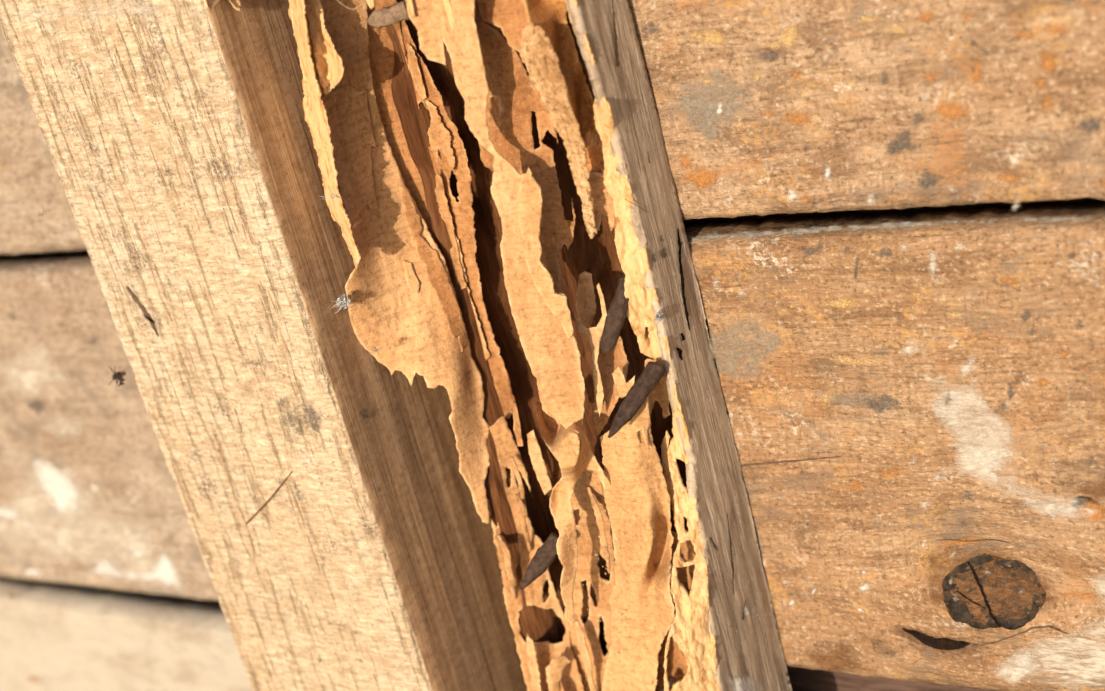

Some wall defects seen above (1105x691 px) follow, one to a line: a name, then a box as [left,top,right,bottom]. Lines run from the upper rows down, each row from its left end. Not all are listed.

peeling [321,88,378,228]
peeling [397,43,490,360]
peeling [517,168,573,338]
peeling [512,401,552,495]
peeling [631,396,678,534]
crack [902,539,1068,650]